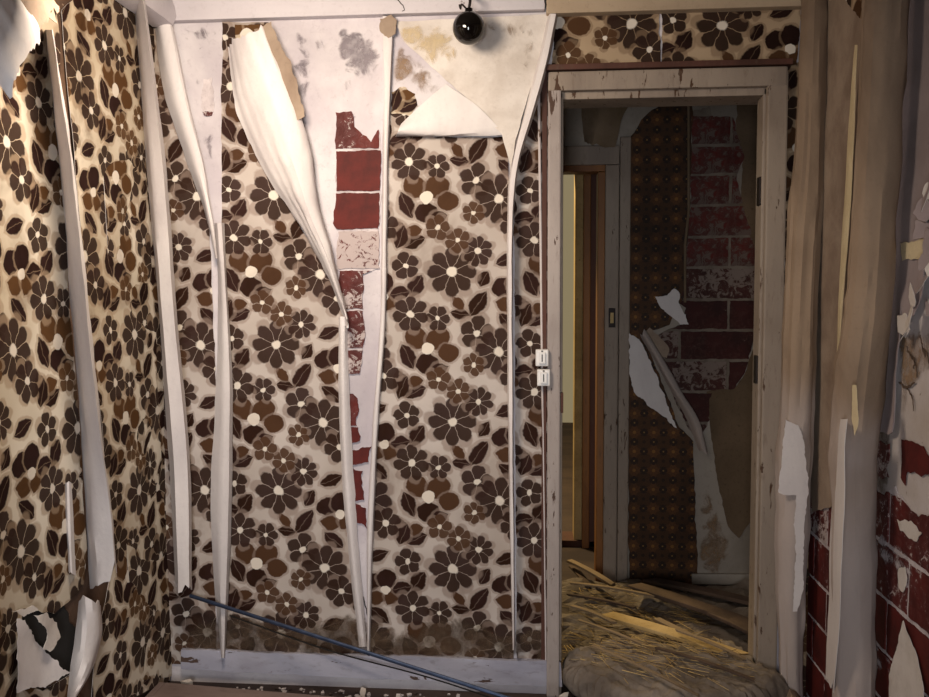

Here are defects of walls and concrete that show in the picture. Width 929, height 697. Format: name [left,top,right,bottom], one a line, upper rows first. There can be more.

flaking render [201,78,215,117]
damp [340,31,376,73]
flaking render [333,111,382,374]
flaking render [659,106,755,432]
peeling [875,0,929,697]
flaking render [350,393,372,528]
flaking render [805,491,832,697]